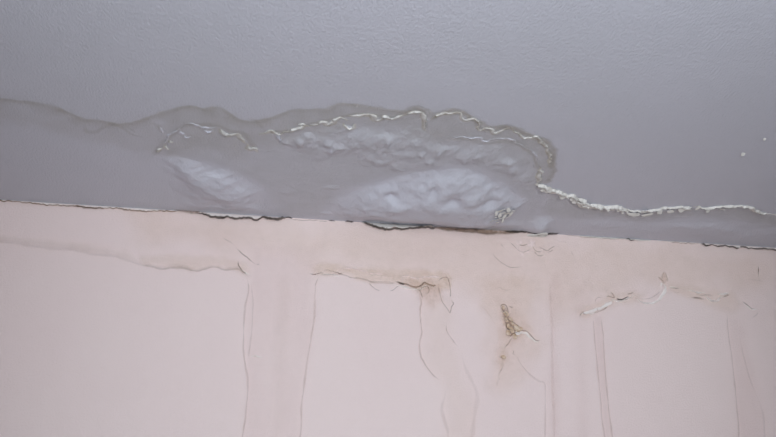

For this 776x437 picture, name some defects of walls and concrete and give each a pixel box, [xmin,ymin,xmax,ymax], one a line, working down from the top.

peeling [259,111,776,217]
crack [0,200,176,212]
crack [198,213,291,221]
crack [329,220,452,230]
crack [504,229,558,237]
crack [685,243,776,251]
crack [313,267,445,290]